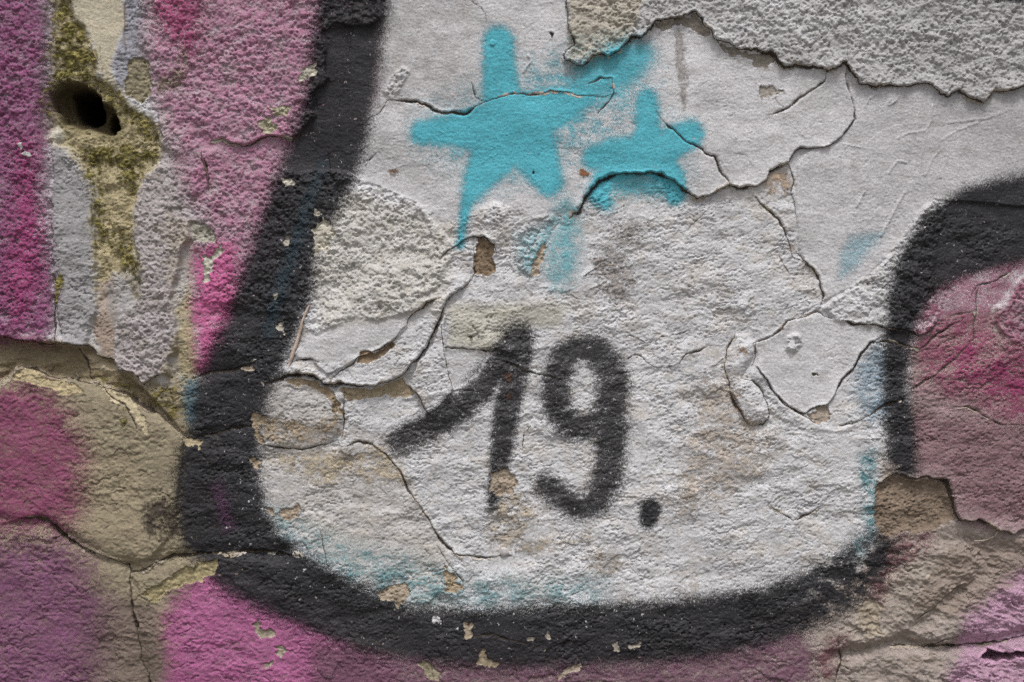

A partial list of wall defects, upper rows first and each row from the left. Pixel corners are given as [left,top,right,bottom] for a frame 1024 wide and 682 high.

spalling [655,13,774,70]
crack [201,132,302,182]
crack [355,0,1024,427]
spalling [473,238,496,277]
spalling [12,368,83,396]
spalling [102,388,149,435]
crack [0,236,556,591]
peeling [180,436,203,450]
crack [769,503,819,520]
spalling [873,475,956,540]
crack [879,472,1023,535]
crack [21,515,328,682]